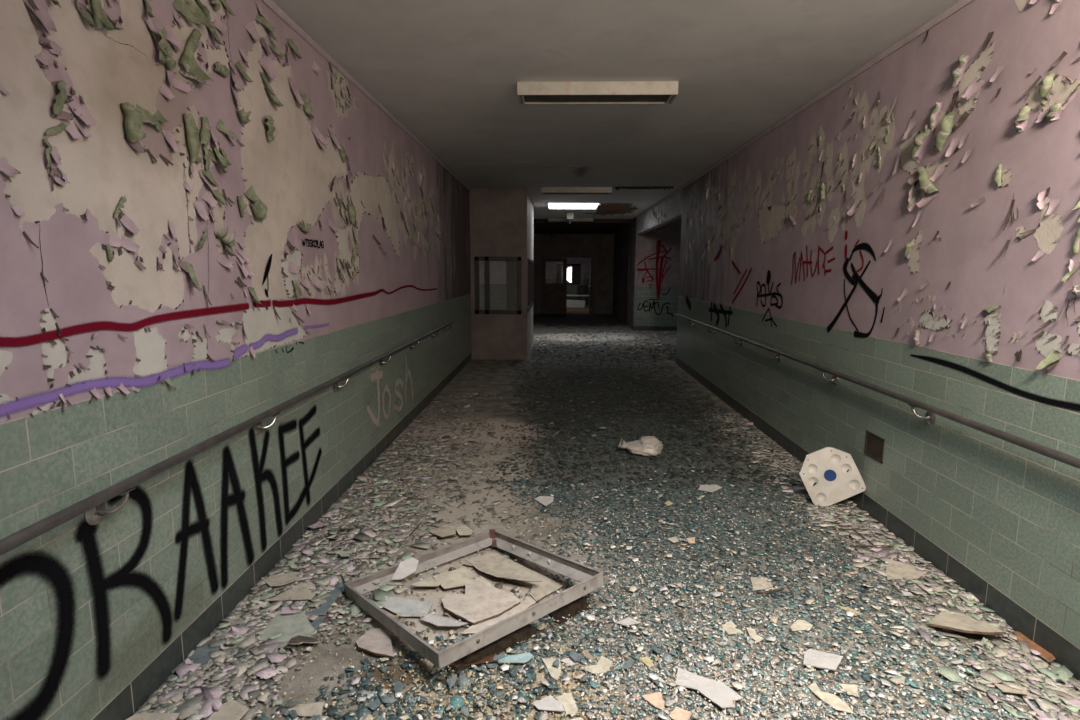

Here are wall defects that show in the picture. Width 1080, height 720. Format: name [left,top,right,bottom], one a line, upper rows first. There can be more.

peeling [1015,0,1039,11]
peeling [0,0,401,376]
peeling [586,186,681,230]
peeling [24,308,177,421]